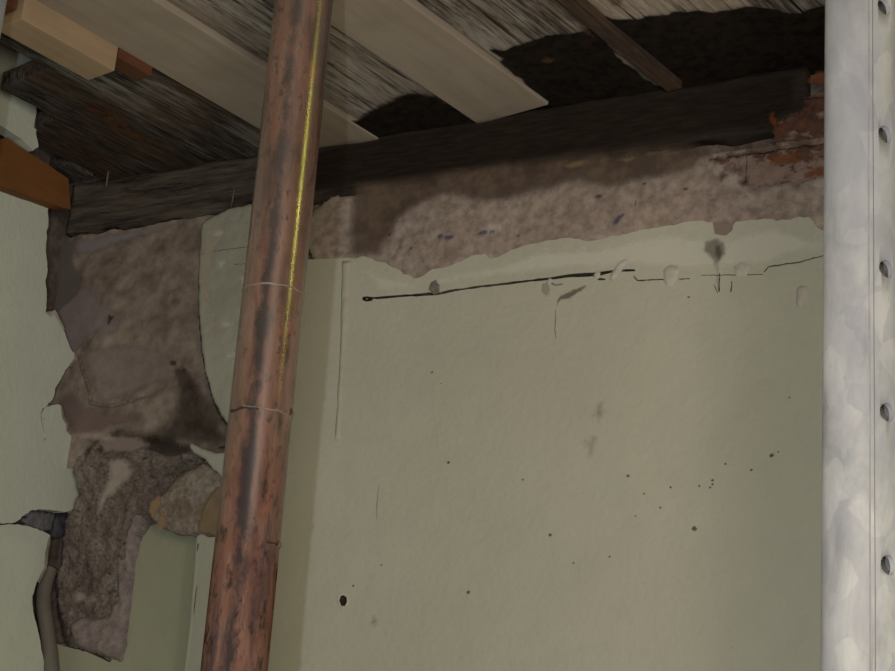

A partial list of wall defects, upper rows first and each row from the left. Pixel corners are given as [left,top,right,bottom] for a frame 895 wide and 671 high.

spalling [309,88,824,295]
damp [315,5,825,252]
crack [362,255,823,301]
damp [706,241,723,261]
spalling [0,215,228,662]